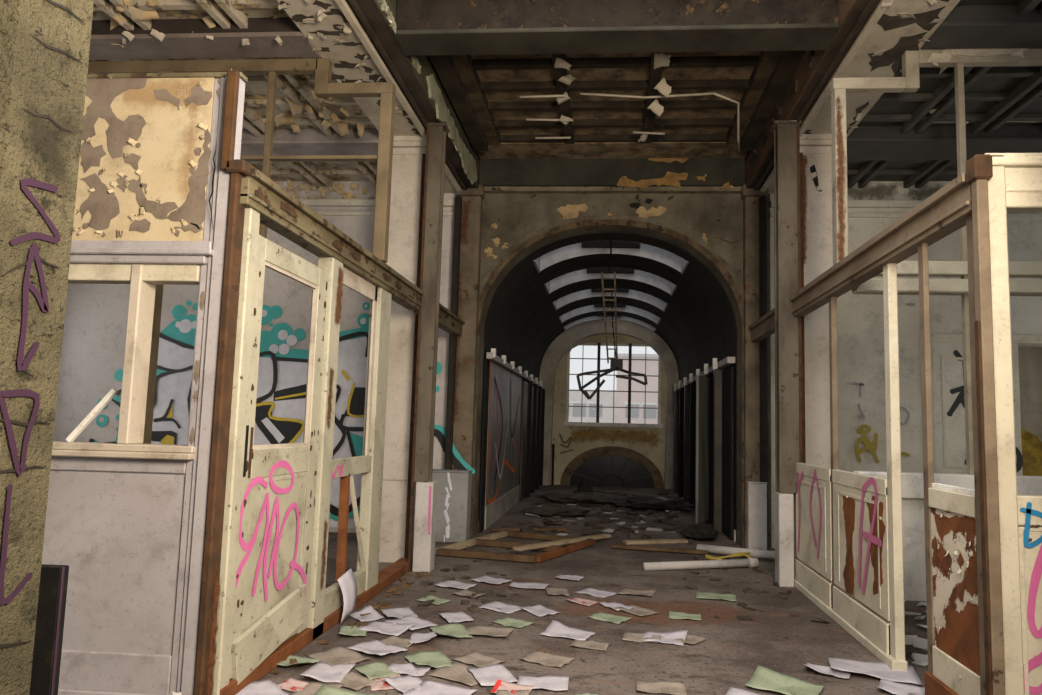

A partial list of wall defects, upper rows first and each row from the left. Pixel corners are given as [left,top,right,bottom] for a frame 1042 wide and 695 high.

peeling [97,0,165,47]
peeling [189,0,215,40]
peeling [273,0,387,83]
peeling [379,0,397,34]
peeling [868,0,1029,77]
peeling [74,58,232,237]
peeling [263,74,365,137]
peeling [411,56,477,184]
peeling [617,158,706,189]
rust [836,98,845,260]
peeling [842,495,885,596]
peeling [934,513,980,680]